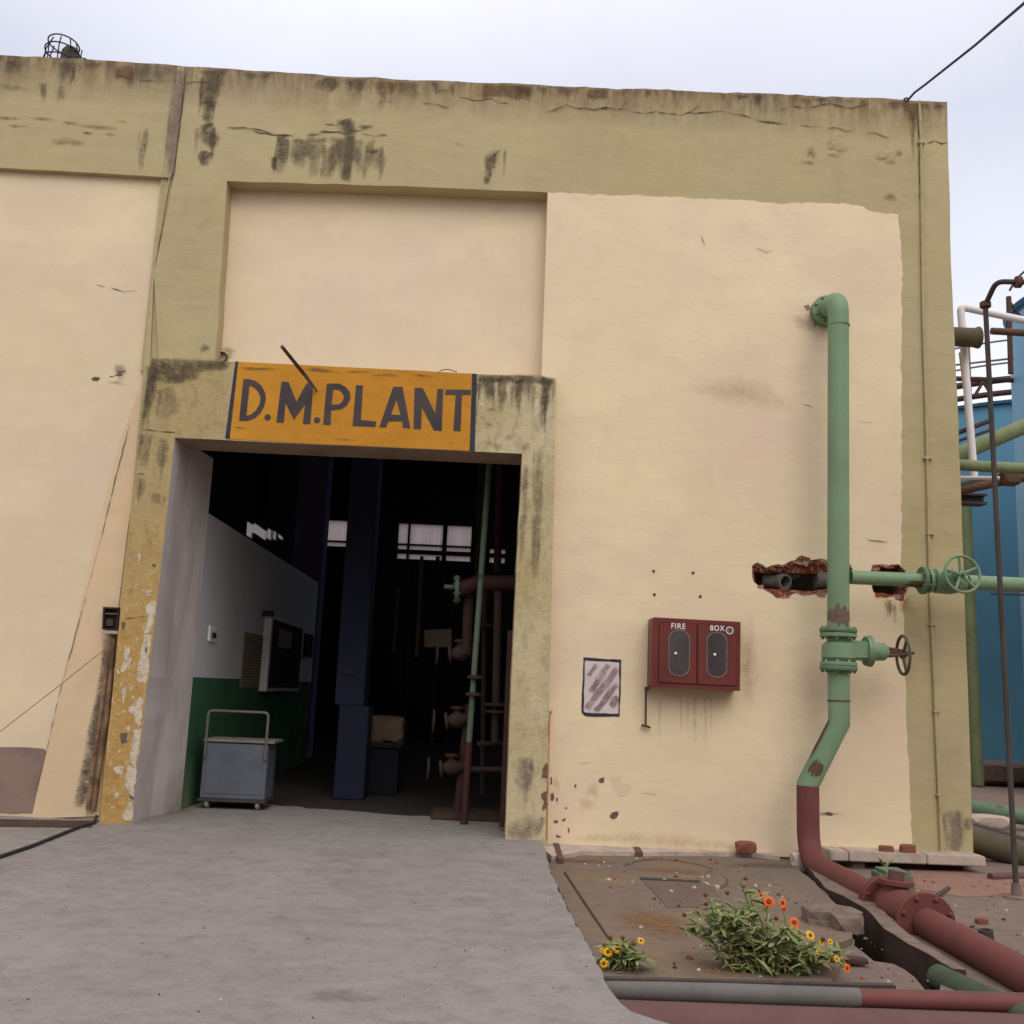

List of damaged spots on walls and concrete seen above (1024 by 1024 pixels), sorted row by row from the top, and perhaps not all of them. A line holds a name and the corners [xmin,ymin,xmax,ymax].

damp [196,70,223,163]
crack [383,89,497,107]
crack [548,99,889,138]
damp [272,119,383,180]
damp [142,360,227,421]
flaking render [752,556,827,599]
flaking render [871,564,905,573]
flaking render [872,586,907,601]
peeling [113,590,157,821]
flaking render [541,763,570,838]